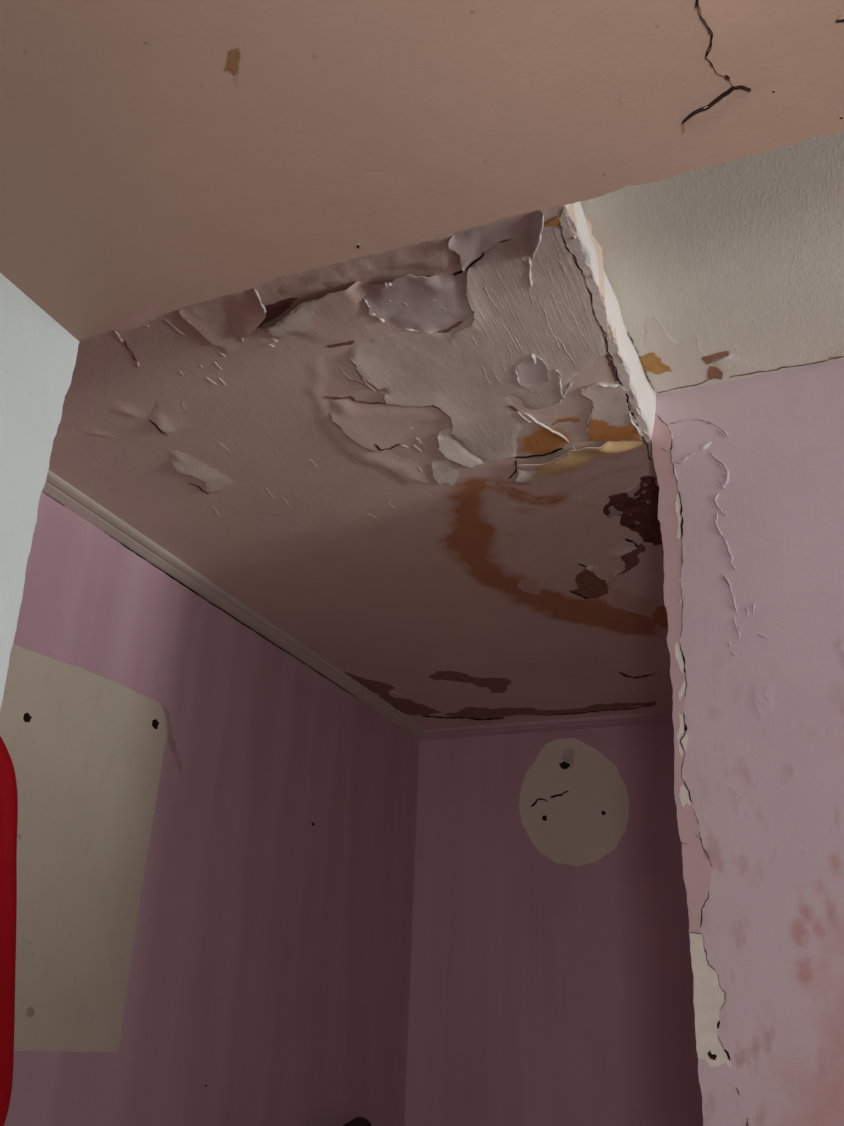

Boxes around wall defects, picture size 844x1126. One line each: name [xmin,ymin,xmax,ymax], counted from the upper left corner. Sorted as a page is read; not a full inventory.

crack [679,85,751,147]
peeling [164,208,651,486]
peeling [640,315,750,392]
peeling [147,397,235,494]
leakage [424,441,668,641]
spalling [569,476,663,600]
crack [558,219,844,931]
peeling [670,418,755,657]
peeling [344,671,657,721]
spalling [675,642,688,756]
crack [531,791,568,807]
spalling [689,932,732,1069]